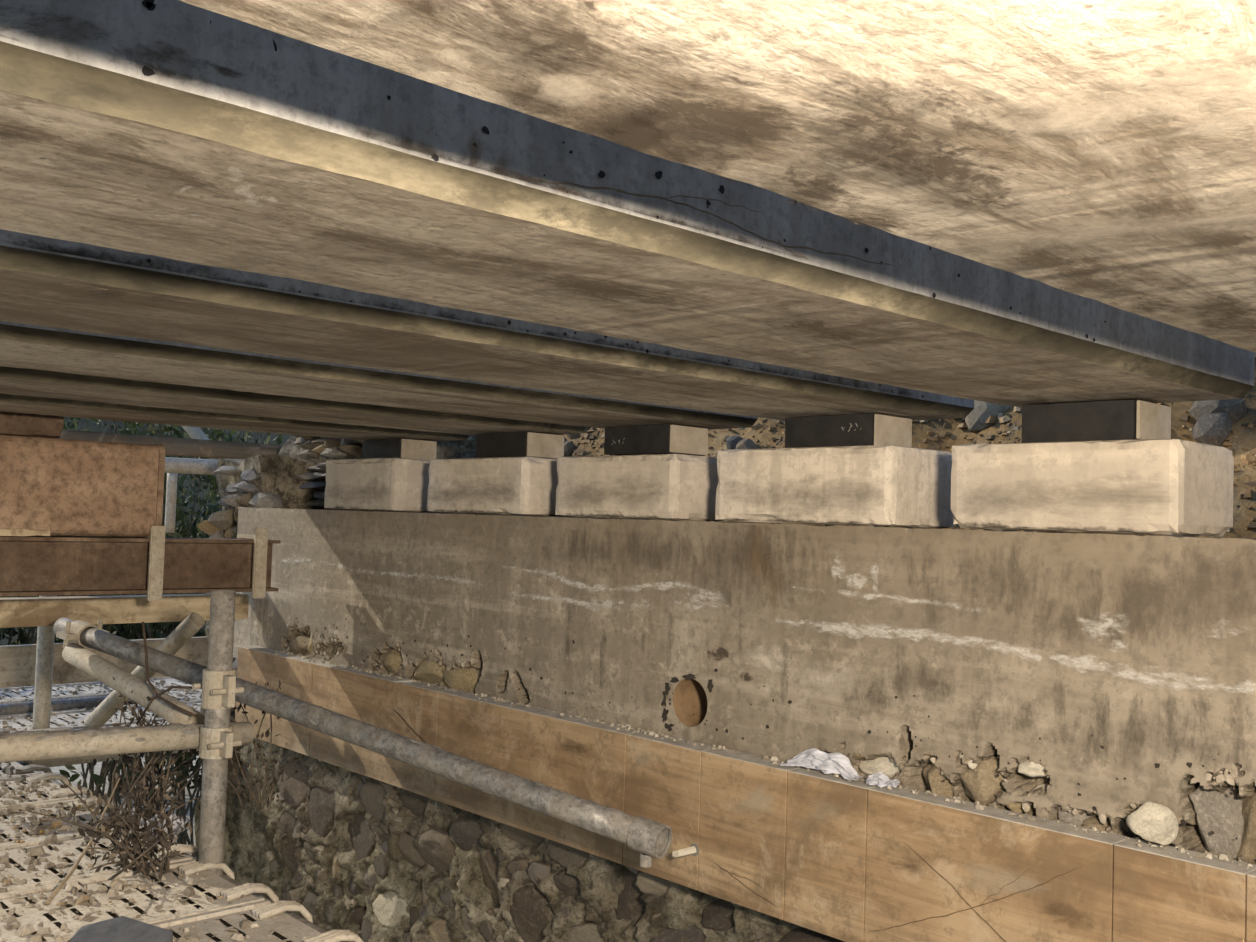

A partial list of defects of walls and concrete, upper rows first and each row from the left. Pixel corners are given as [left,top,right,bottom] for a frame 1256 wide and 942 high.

leakage [0,122,239,200]
leakage [260,196,689,312]
crack [532,179,894,266]
leakage [1004,252,1256,330]
leakage [511,567,718,611]
leakage [832,560,884,599]
spalling [282,617,347,661]
spalling [362,635,529,703]
leakage [822,623,1105,668]
leakage [1118,671,1212,689]
spalling [854,753,901,778]
spalling [922,746,1256,865]